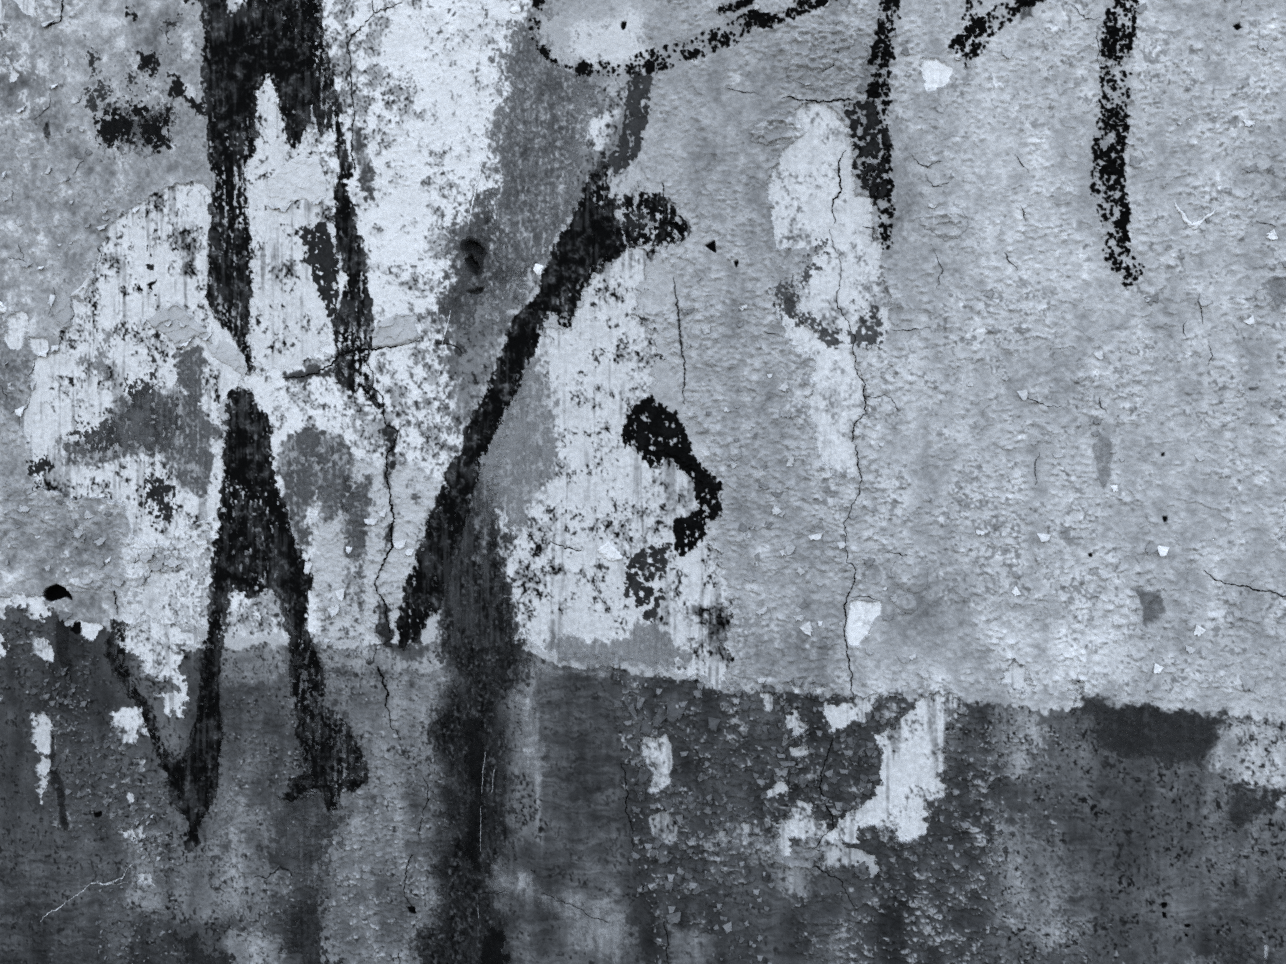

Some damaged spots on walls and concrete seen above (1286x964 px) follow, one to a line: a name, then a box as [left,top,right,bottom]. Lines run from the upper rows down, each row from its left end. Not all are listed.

peeling [4,55,19,83]
peeling [0,0,54,39]
crack [347,1,402,172]
peeling [0,75,341,587]
peeling [767,102,893,484]
peeling [0,591,161,964]
peeling [116,616,201,718]
crack [283,339,462,740]
peeling [393,539,415,556]
leakage [410,472,546,964]
peeling [487,233,1008,964]
peeling [1145,541,1169,557]